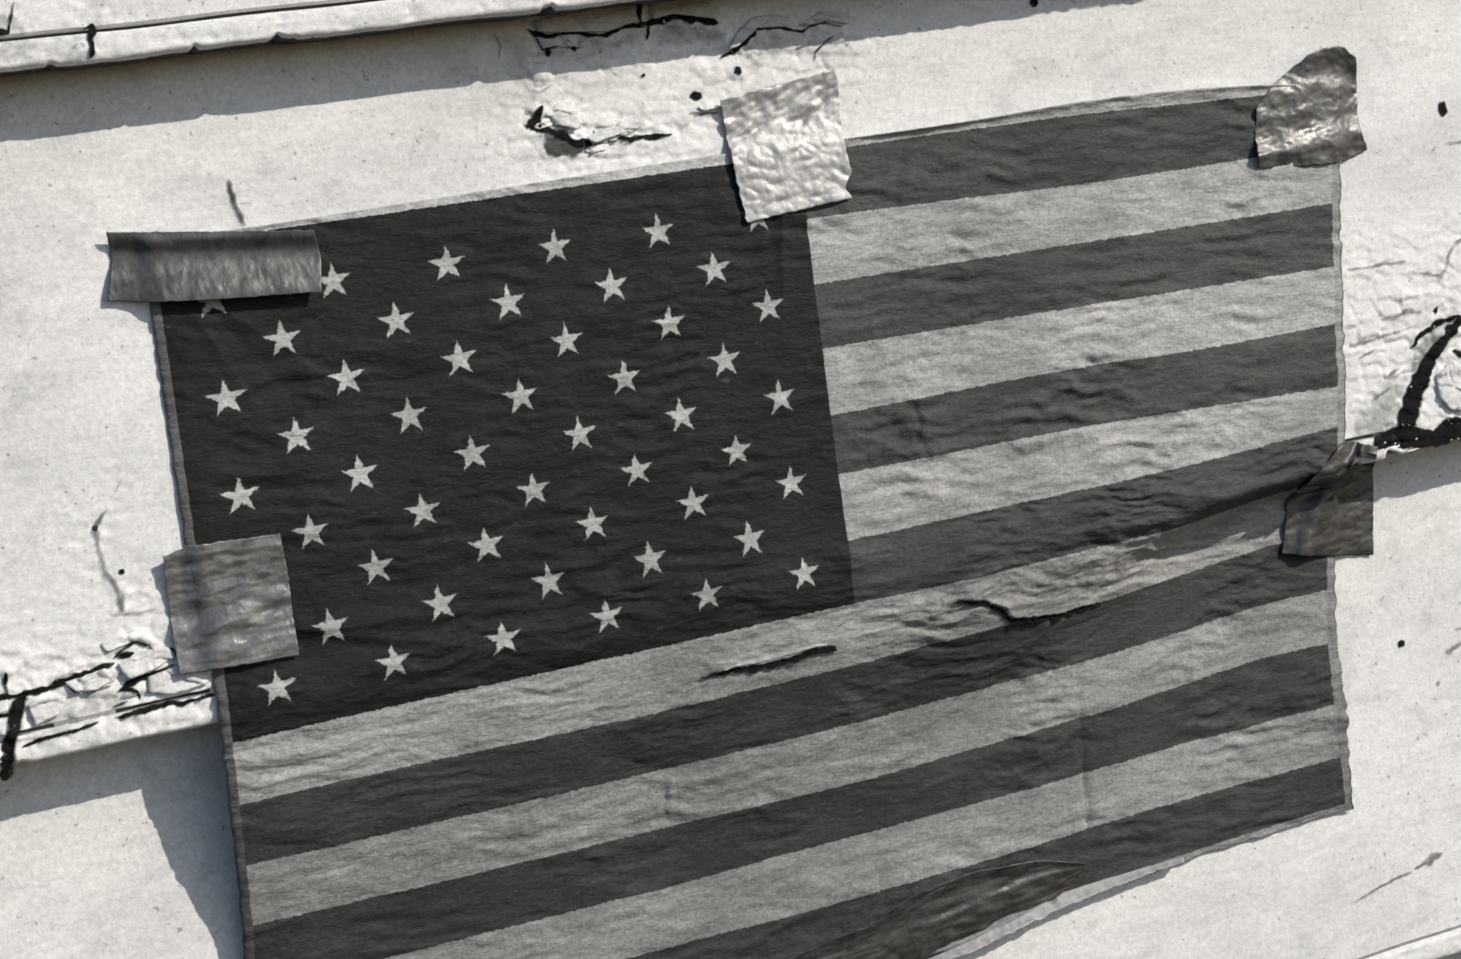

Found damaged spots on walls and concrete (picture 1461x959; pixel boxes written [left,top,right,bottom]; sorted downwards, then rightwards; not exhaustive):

crack [527,1,850,77]
crack [1359,251,1461,449]
crack [0,662,215,781]